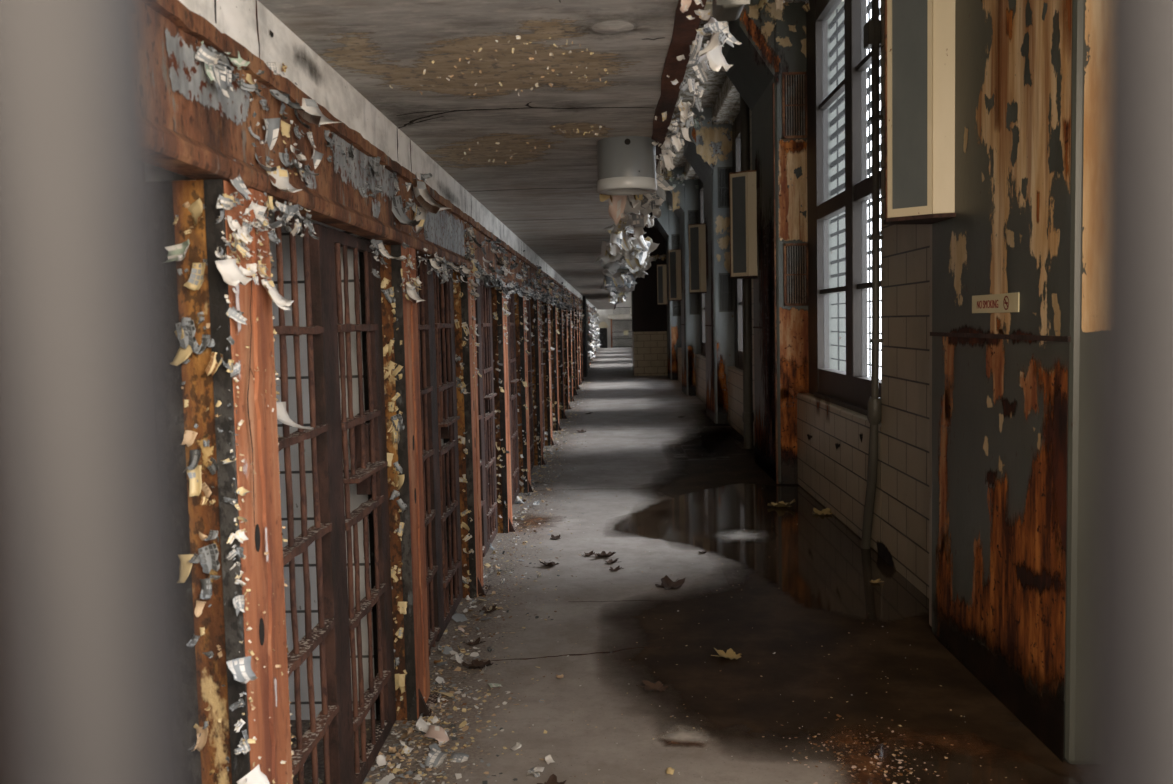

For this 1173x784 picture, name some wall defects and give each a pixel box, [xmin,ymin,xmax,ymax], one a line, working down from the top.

peeling [748,0,810,57]
peeling [165,28,608,784]
peeling [596,0,742,304]
water stain [647,407,801,501]
rust [754,139,809,484]
peeling [948,230,967,307]
peeling [983,396,1012,473]
peeling [963,0,1093,348]
water stain [606,561,1084,784]